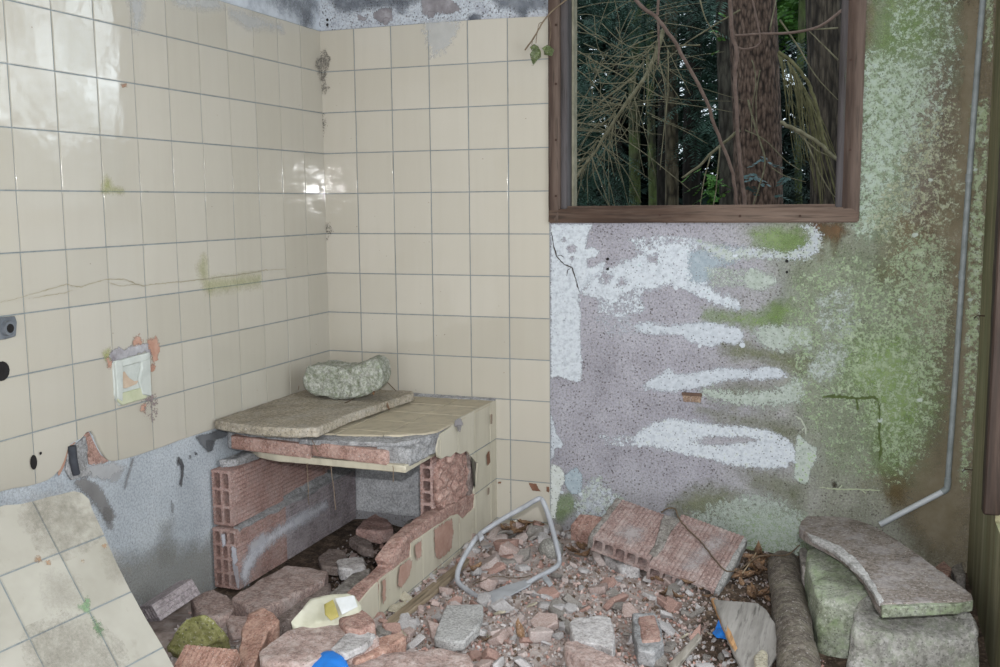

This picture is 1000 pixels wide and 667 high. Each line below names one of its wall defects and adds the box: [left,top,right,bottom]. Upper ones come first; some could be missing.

spalling [357,7,393,25]
spalling [421,0,461,18]
peeling [983,0,994,62]
damp [315,51,330,91]
crack [2,269,282,302]
crack [551,232,580,292]
peeling [550,0,991,490]
damp [887,0,995,557]
spalling [106,333,160,372]
spalling [58,432,108,475]
crack [822,394,883,460]
damp [75,461,124,523]